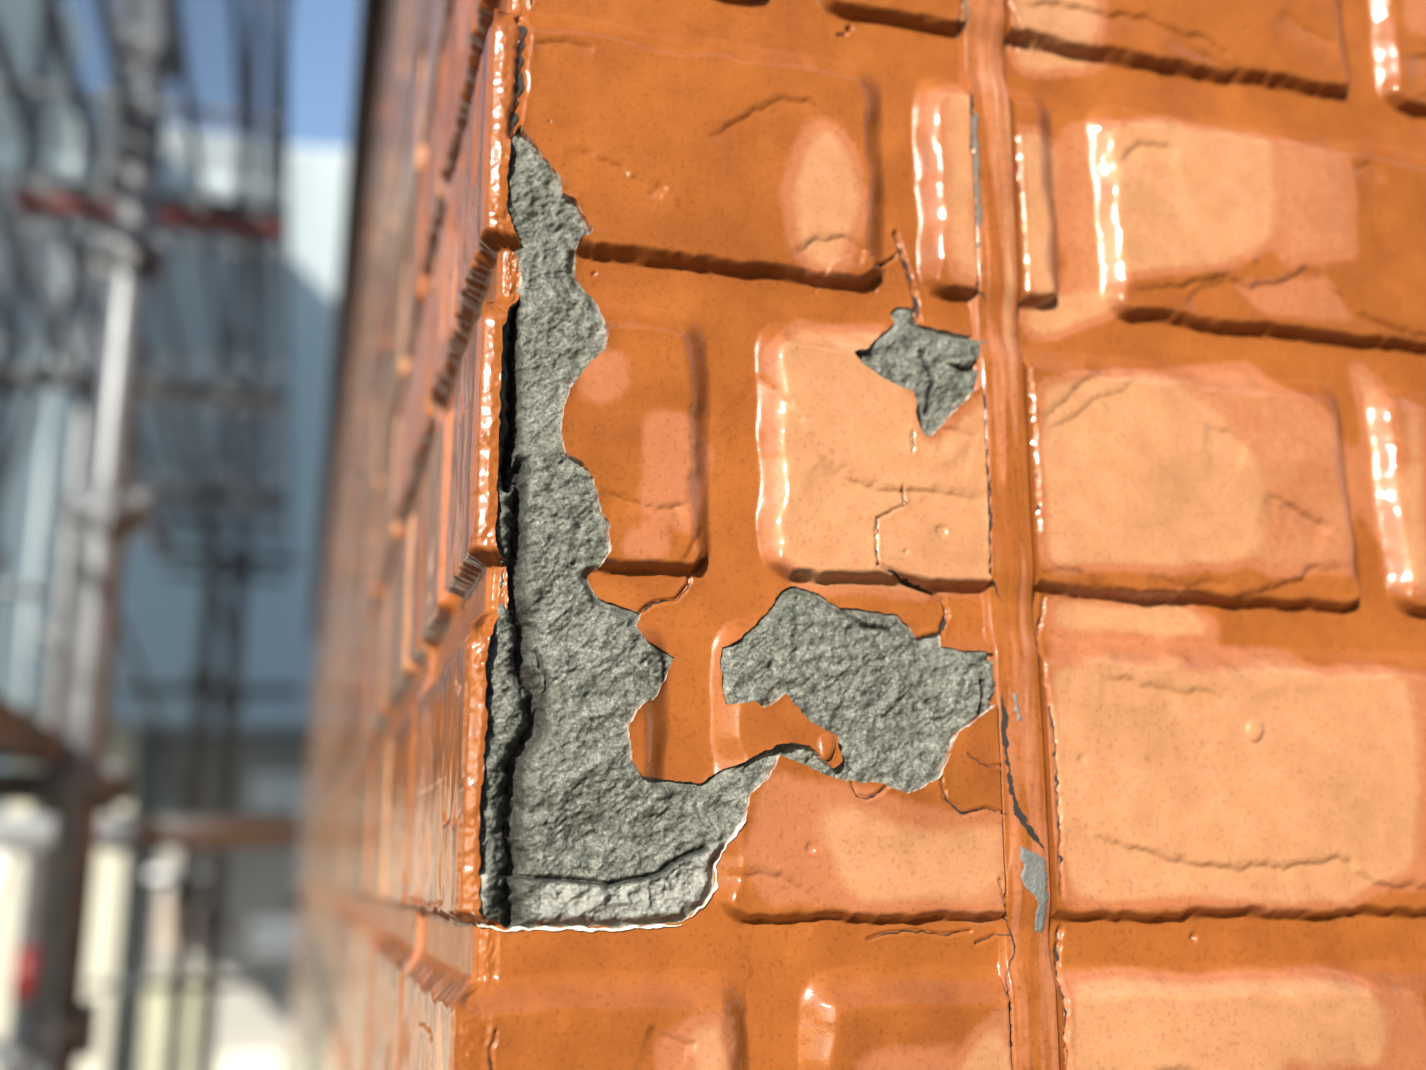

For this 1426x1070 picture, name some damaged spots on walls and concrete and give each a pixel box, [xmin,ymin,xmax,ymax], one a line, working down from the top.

crack [876,236,920,321]
spalling [471,113,995,932]
crack [875,486,946,640]
peeling [1013,693,1022,721]